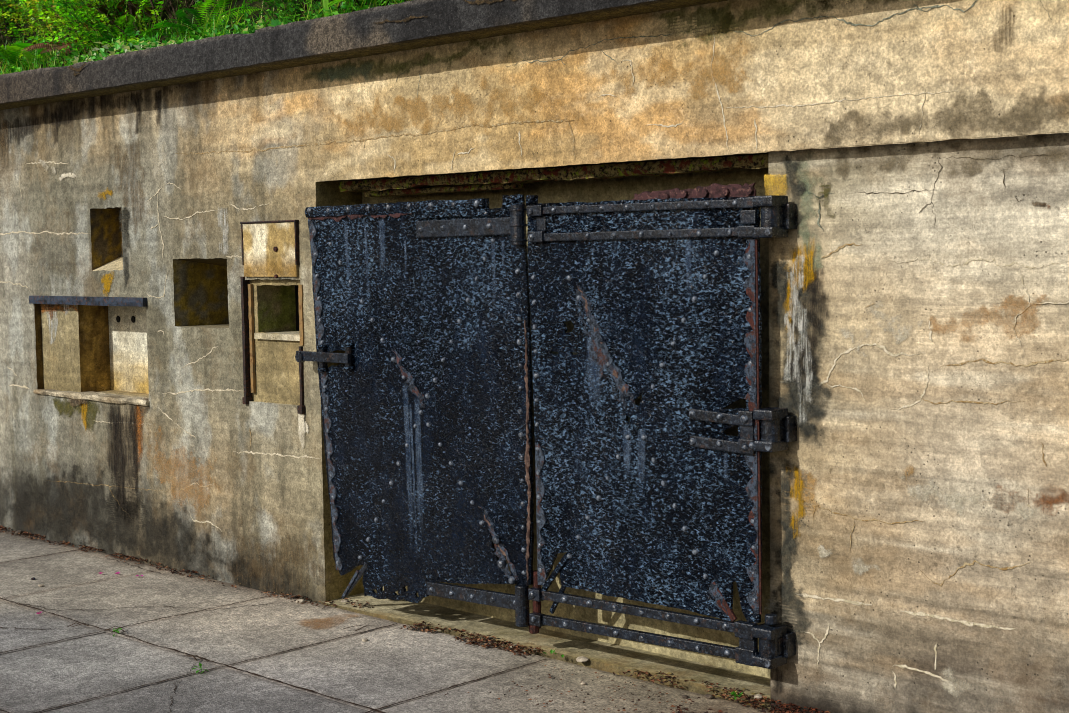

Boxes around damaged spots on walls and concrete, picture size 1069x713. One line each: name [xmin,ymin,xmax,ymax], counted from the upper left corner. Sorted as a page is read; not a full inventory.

crack [506,0,977,150]
damp [824,111,861,143]
damp [891,114,921,133]
damp [936,92,989,149]
damp [995,95,1069,163]
damp [0,87,172,287]
crack [799,181,862,258]
crack [866,153,1067,225]
damp [761,155,830,445]
crack [820,257,1069,410]
damp [13,398,237,572]
corrosion [1037,492,1069,510]